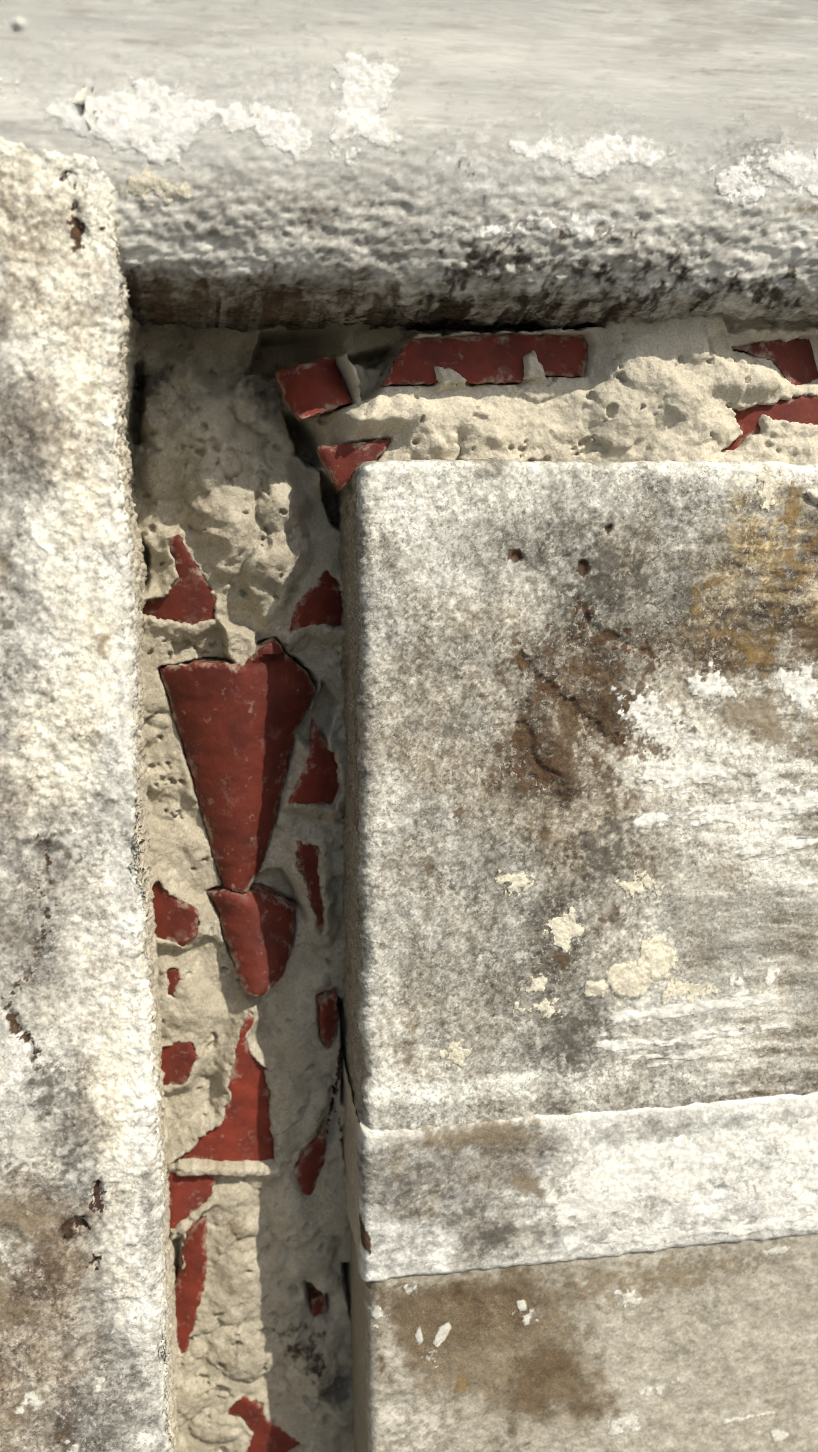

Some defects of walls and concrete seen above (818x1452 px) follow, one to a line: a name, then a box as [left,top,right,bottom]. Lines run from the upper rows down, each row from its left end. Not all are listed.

peeling [0,32,818,243]
water stain [369,1246,790,1434]